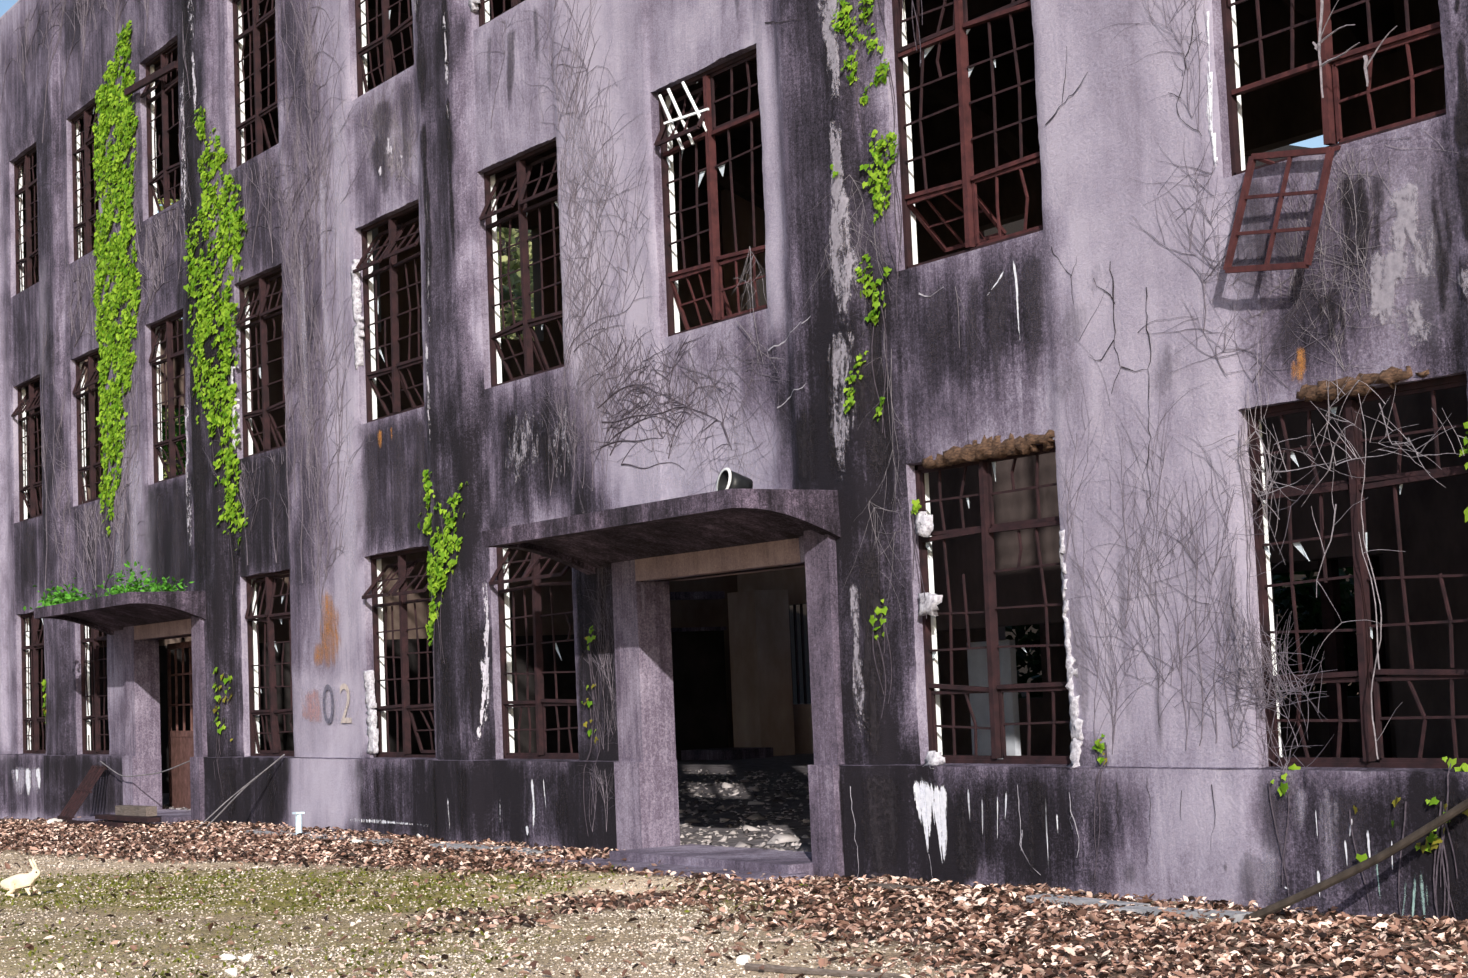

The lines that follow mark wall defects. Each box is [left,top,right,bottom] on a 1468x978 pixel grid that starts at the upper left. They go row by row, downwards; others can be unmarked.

peeling [818,0,840,96]
water stain [156,0,225,582]
water stain [373,0,450,310]
peeling [829,124,858,313]
peeling [1369,183,1438,346]
peeling [831,333,854,461]
rust [1293,350,1304,378]
peeling [850,586,865,731]
water stain [16,768,41,794]
water stain [861,776,1007,880]
water stain [1342,814,1393,886]
water stain [1403,881,1425,917]